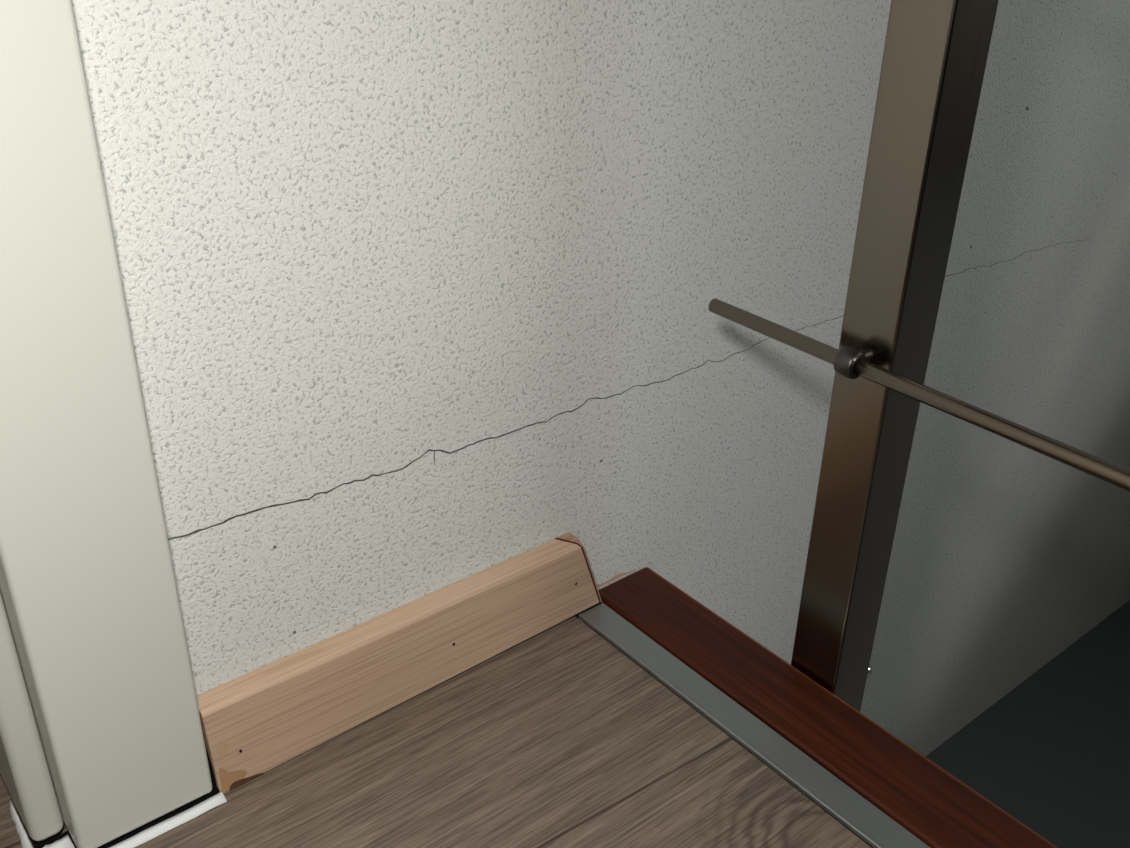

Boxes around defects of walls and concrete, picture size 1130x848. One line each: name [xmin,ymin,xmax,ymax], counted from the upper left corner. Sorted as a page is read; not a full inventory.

crack [168,315,844,540]